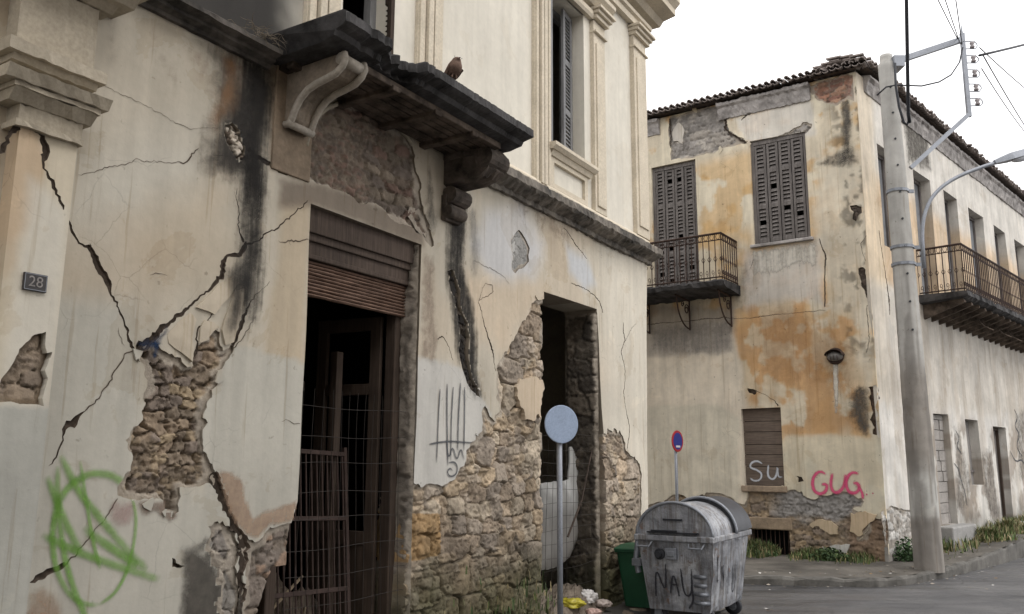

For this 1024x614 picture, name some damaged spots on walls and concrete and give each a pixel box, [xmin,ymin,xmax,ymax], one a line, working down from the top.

crack [82,88,208,175]
water stain [218,59,271,327]
flaking render [306,101,432,246]
water stain [824,100,854,165]
flaking render [0,333,47,405]
crack [0,126,308,465]
flaking render [117,331,295,614]
water stain [447,209,481,395]
flaking render [391,295,545,614]
crack [478,264,508,365]
flaking render [700,476,912,562]
water stain [851,388,868,434]